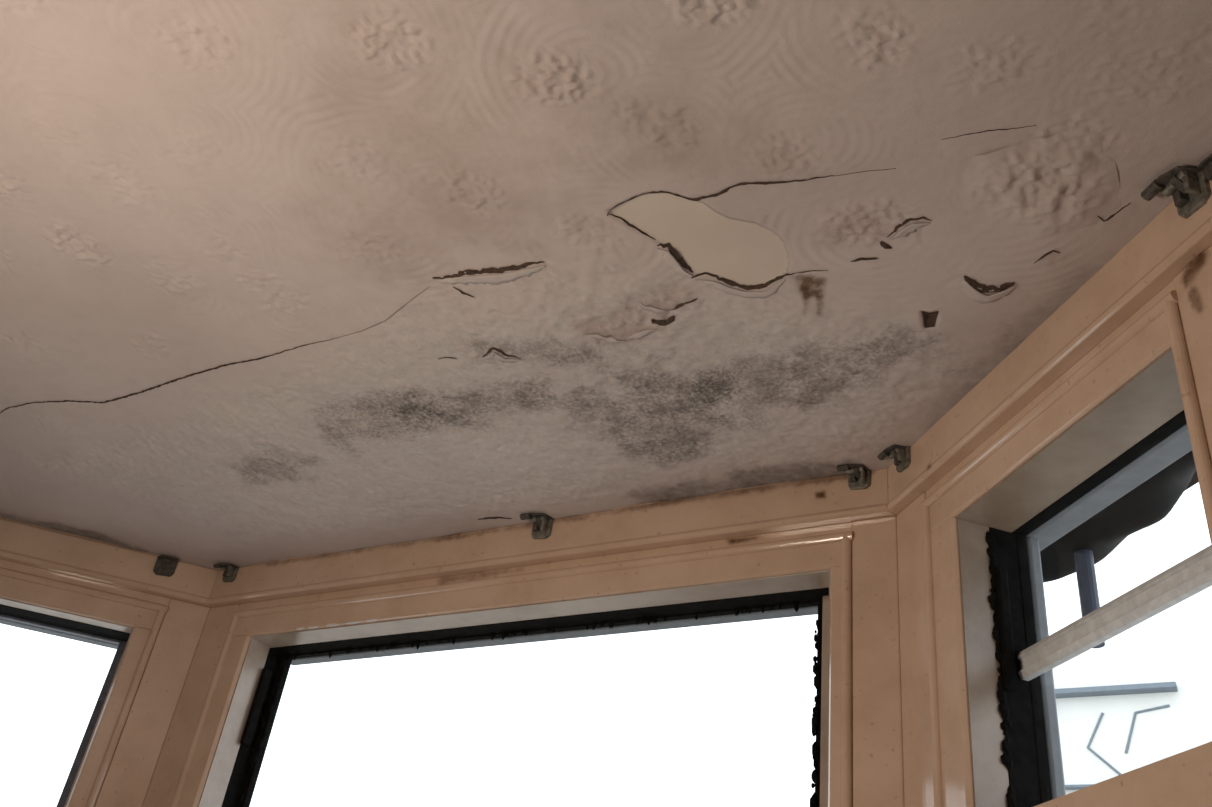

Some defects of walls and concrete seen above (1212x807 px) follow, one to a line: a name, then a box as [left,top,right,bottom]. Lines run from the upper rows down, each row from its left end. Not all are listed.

crack [0,261,544,413]
flaking render [610,193,790,299]
flaking render [961,280,1016,304]